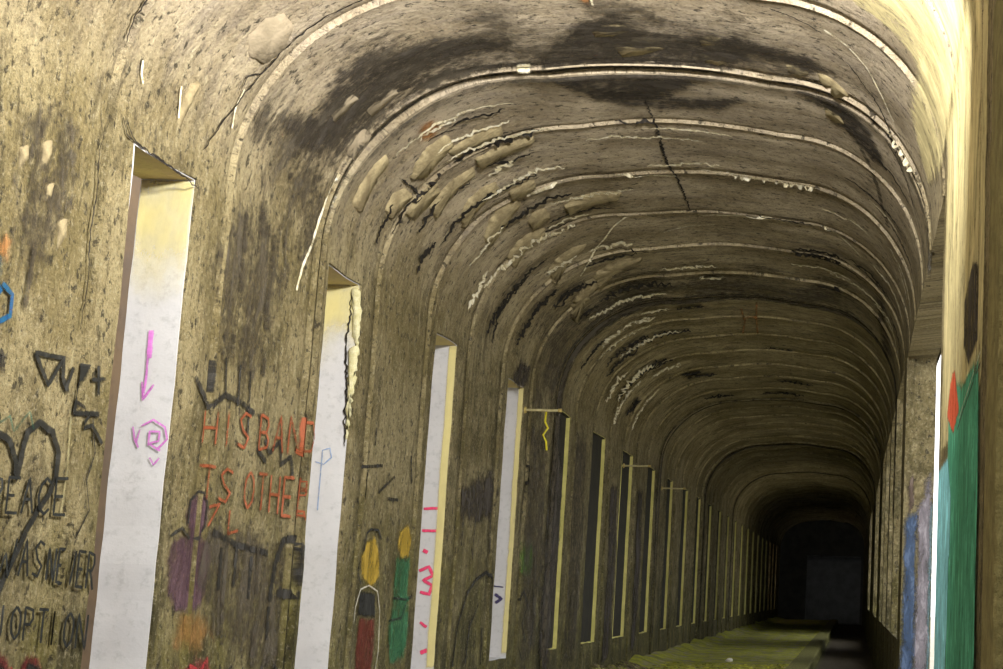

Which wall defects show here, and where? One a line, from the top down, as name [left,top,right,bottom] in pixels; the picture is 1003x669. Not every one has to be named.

crack [376,108,614,273]
water stain [212,0,965,383]
crack [615,101,691,212]
crack [487,248,734,416]
crack [763,380,813,397]